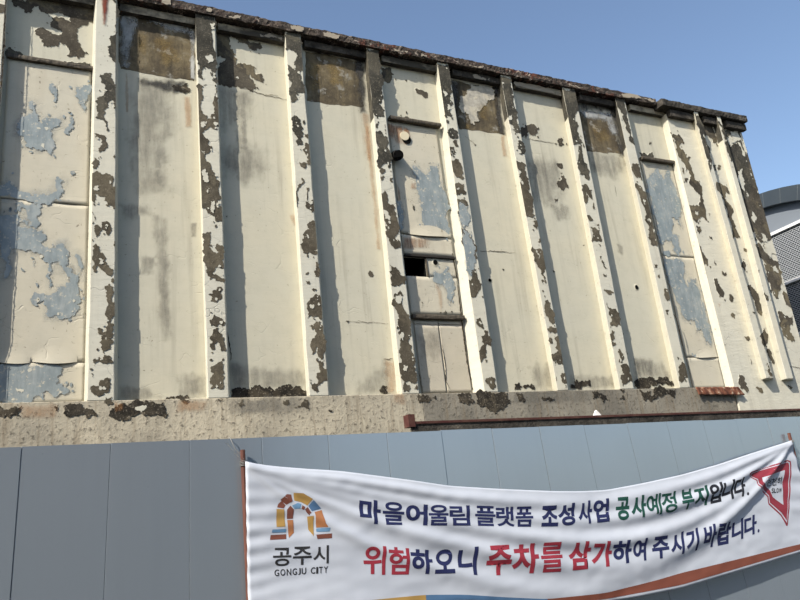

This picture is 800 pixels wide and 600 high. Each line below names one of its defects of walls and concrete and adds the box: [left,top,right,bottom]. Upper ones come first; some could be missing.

peeling [0,0,94,66]
peeling [0,73,116,405]
peeling [195,13,265,302]
damp [305,51,364,107]
peeling [367,49,407,182]
peeling [381,190,404,249]
peeling [412,64,492,298]
damp [579,112,622,154]
peeling [694,113,795,343]
peeling [209,312,226,389]
peeling [760,327,775,376]
rust [695,387,745,395]